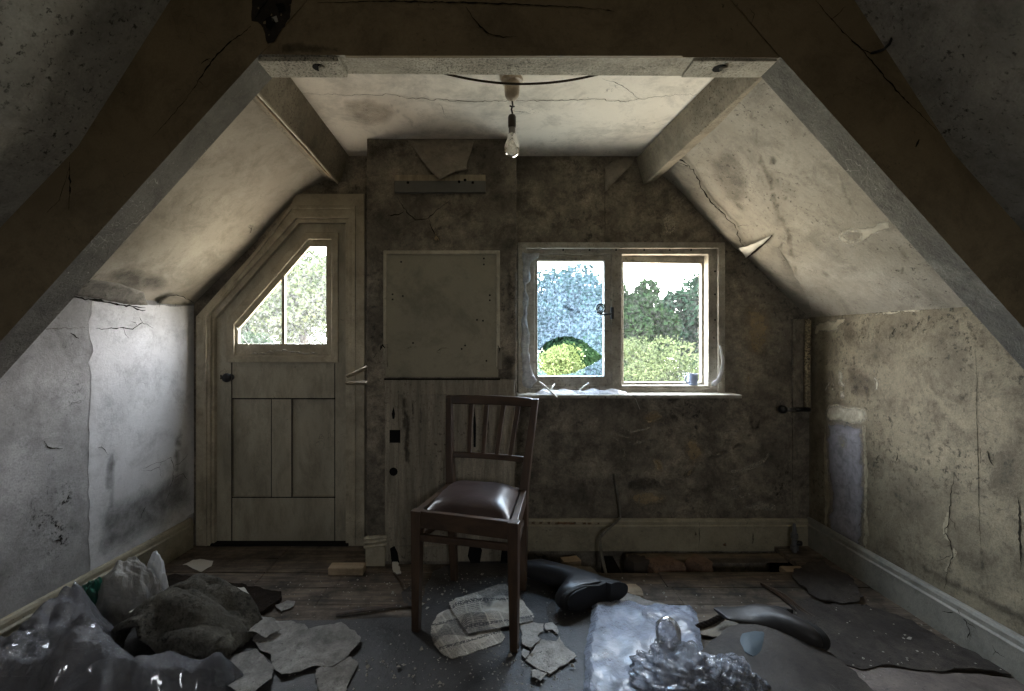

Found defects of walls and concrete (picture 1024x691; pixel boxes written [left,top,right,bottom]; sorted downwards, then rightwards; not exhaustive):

crack [678,159,742,243]
crack [49,295,194,338]
peeling [823,372,869,549]
crack [937,356,994,638]